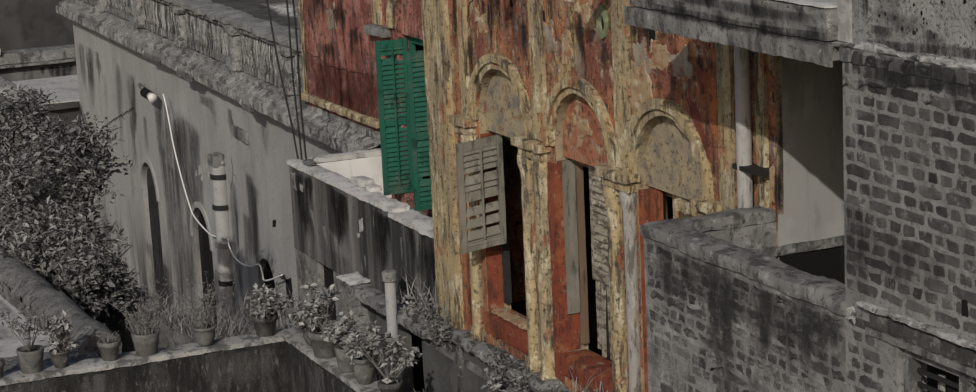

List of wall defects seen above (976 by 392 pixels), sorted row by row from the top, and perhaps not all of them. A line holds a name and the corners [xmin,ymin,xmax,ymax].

damp [316,45,373,115]
peeling [475,7,487,35]
peeling [543,10,572,64]
peeling [574,0,596,30]
peeling [631,29,712,163]
damp [867,3,976,97]
damp [156,111,201,238]
damp [234,178,258,253]
damp [295,173,312,231]
damp [331,189,348,243]
damp [374,214,391,264]
damp [409,231,435,294]